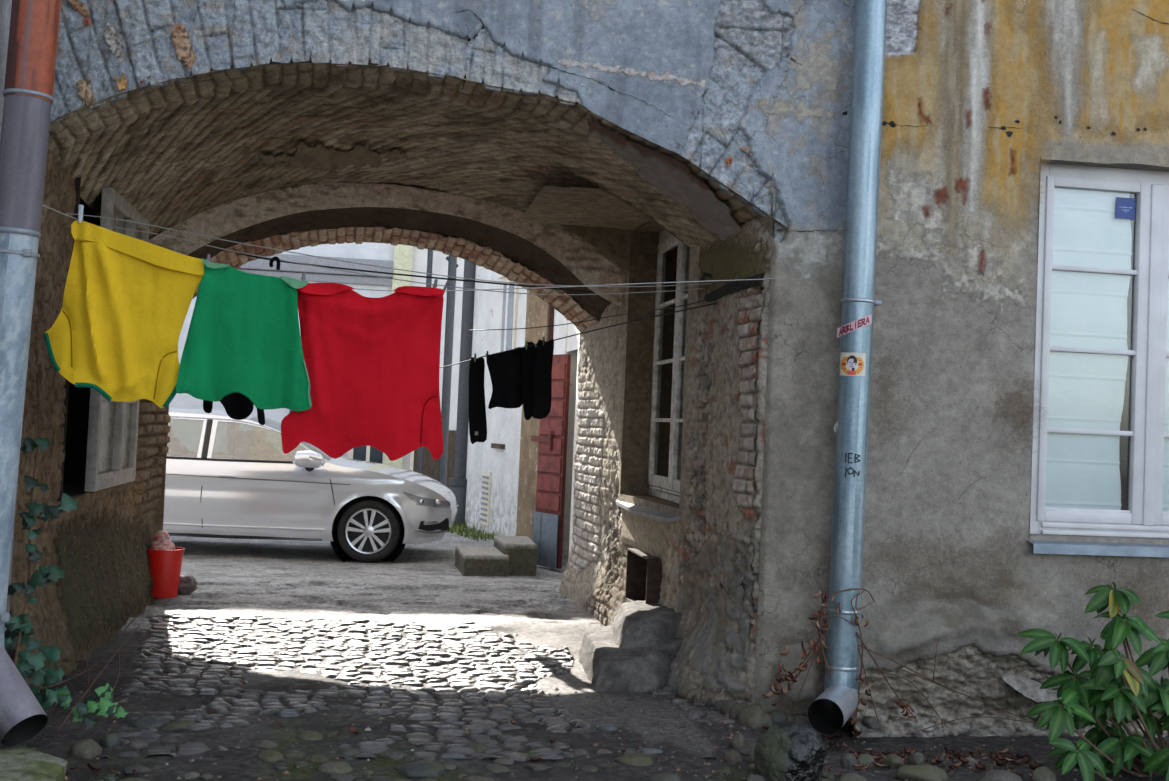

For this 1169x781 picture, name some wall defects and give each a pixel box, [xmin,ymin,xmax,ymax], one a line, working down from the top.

flaking render [50,0,848,280]
peeling [876,0,1028,314]
peeling [974,0,1049,230]
peeling [1054,0,1169,139]
flaking render [732,287,765,521]
flaking render [852,644,1168,738]